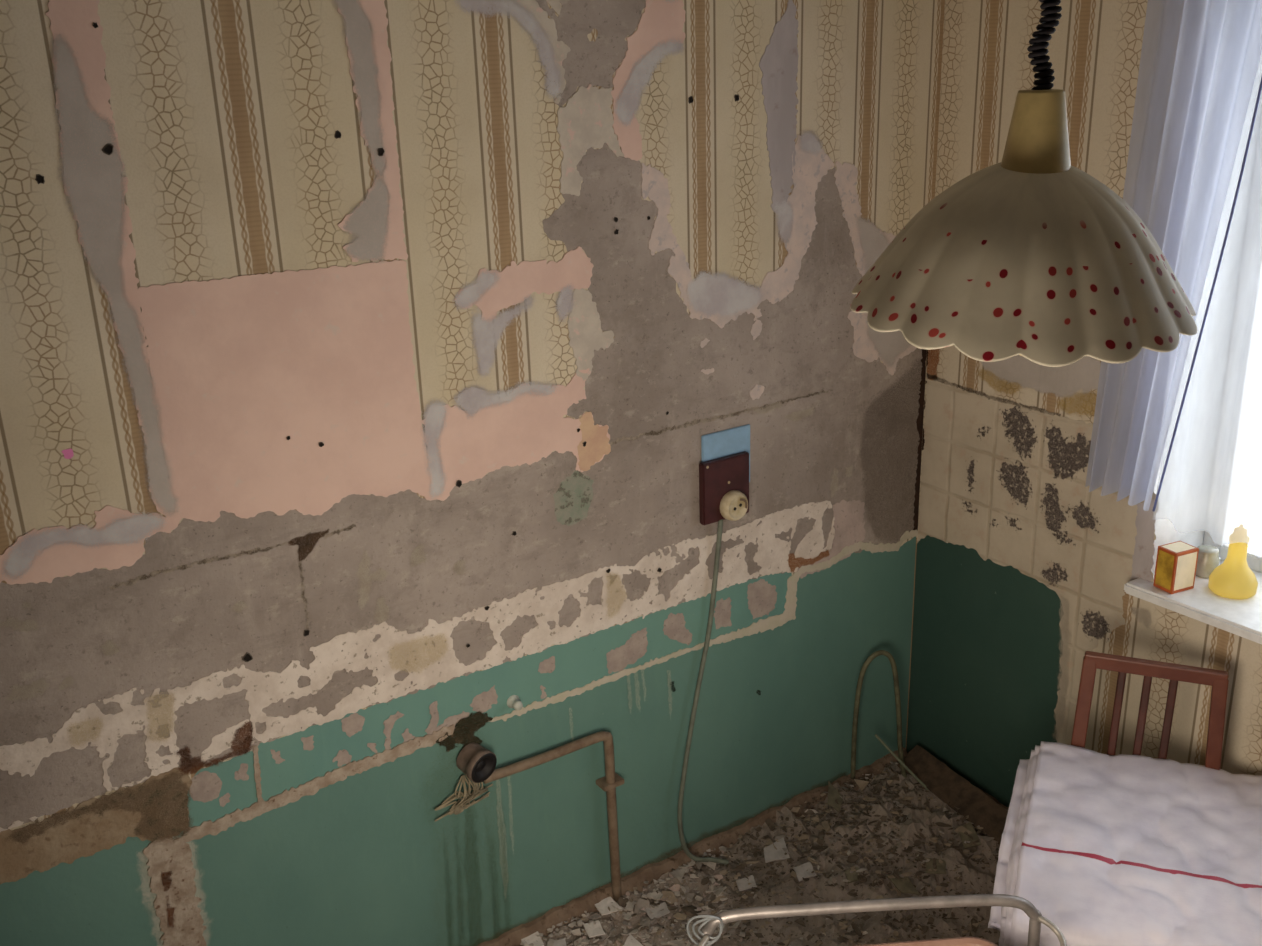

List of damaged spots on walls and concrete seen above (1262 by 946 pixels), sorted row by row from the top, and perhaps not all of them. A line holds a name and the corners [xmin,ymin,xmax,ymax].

spalling [535,0,646,107]
crack [106,542,310,630]
crack [324,524,355,540]
spalling [0,143,1159,946]
damp [962,456,977,517]
damp [975,367,1102,545]